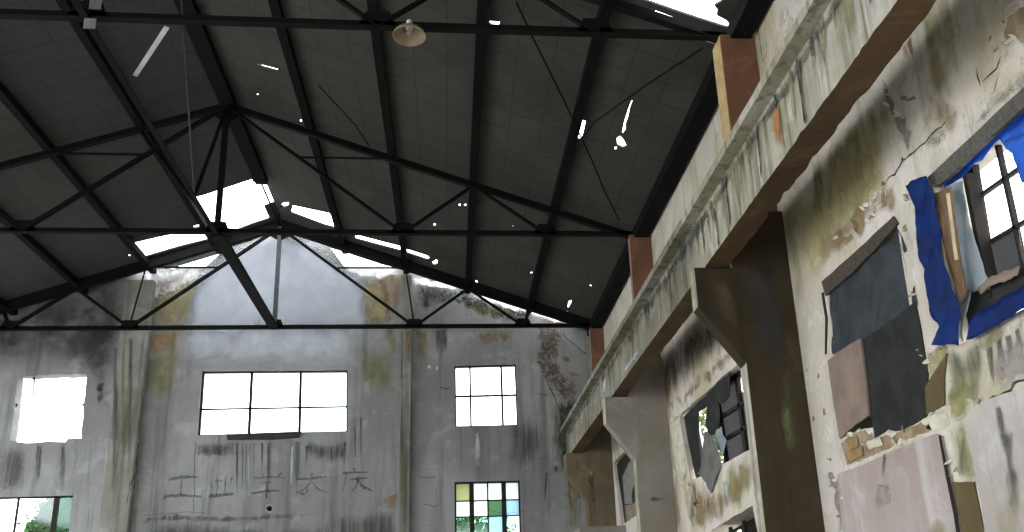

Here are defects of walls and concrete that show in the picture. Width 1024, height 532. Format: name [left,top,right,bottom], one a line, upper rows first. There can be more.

leakage [737,0,853,184]
peeling [881,79,917,153]
crack [881,120,947,209]
peeling [833,186,887,246]
leakage [545,177,726,497]
peeling [915,345,947,379]
leakage [3,451,23,487]
leakage [199,443,270,486]
leakage [290,418,362,483]
flaking render [824,395,980,531]